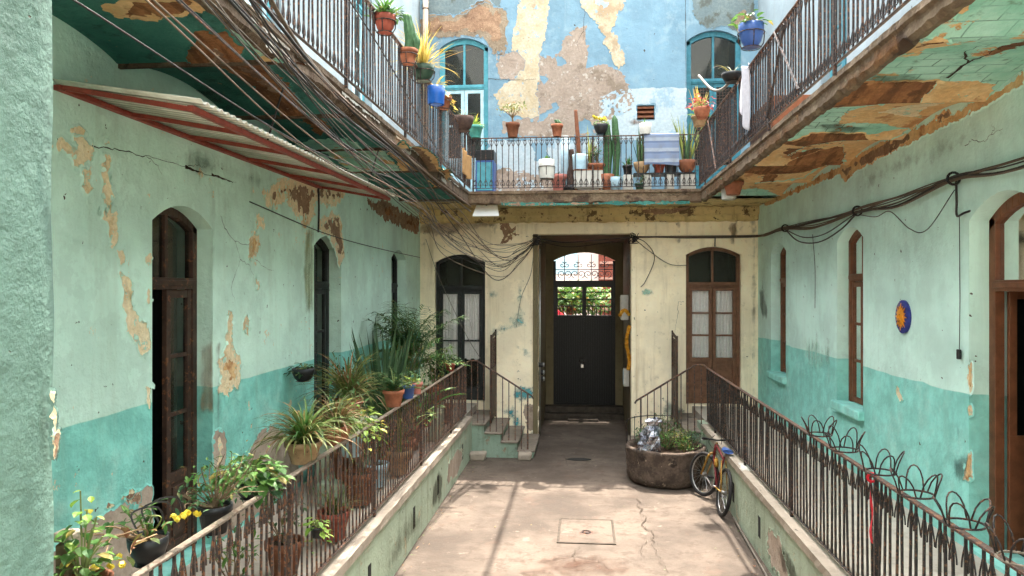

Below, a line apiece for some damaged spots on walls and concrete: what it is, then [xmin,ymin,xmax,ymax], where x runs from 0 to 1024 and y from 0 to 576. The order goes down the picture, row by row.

crack [92,145,233,183]
spalling [98,0,458,187]
peeling [420,0,635,139]
spalling [736,69,1024,207]
crack [946,45,999,78]
peeling [52,123,154,360]
peeling [247,176,346,292]
spalling [366,197,420,235]
peeling [45,387,62,461]
peeling [144,381,155,412]
peeling [216,308,252,404]
crack [546,497,668,575]